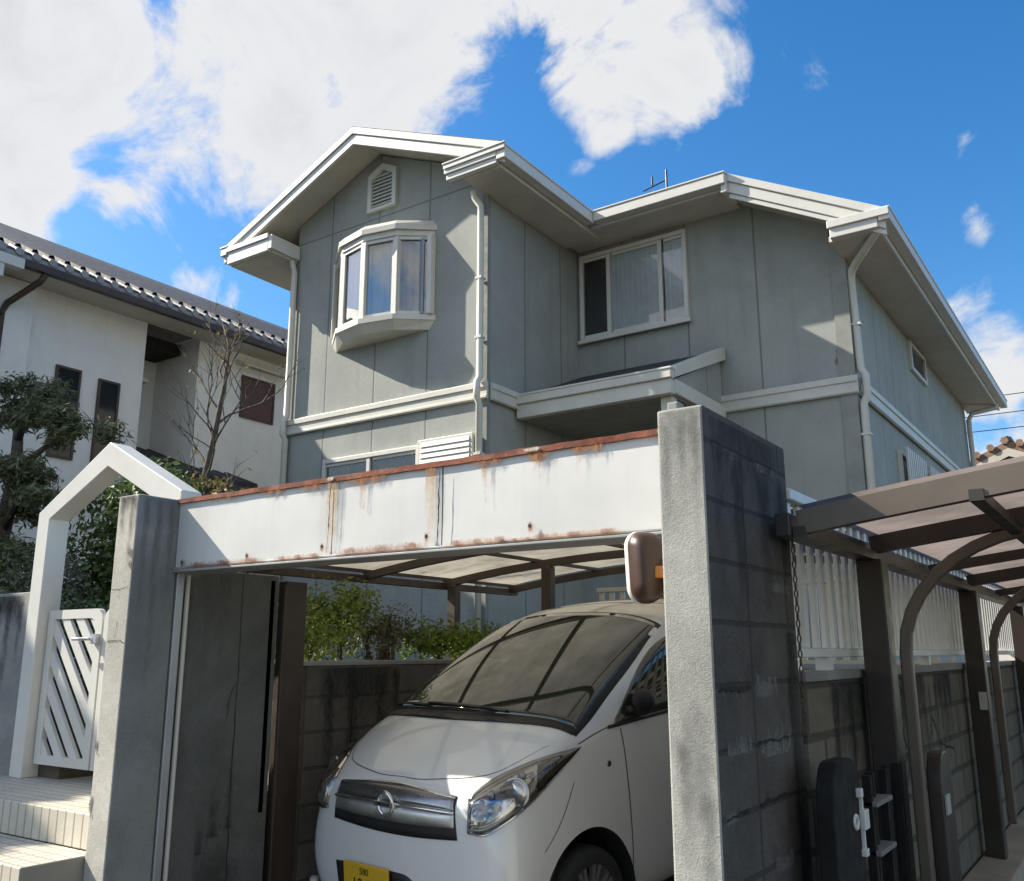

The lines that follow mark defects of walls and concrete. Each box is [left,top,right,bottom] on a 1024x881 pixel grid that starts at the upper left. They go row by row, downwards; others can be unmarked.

rust [340,534,428,555]
rust [453,523,617,546]